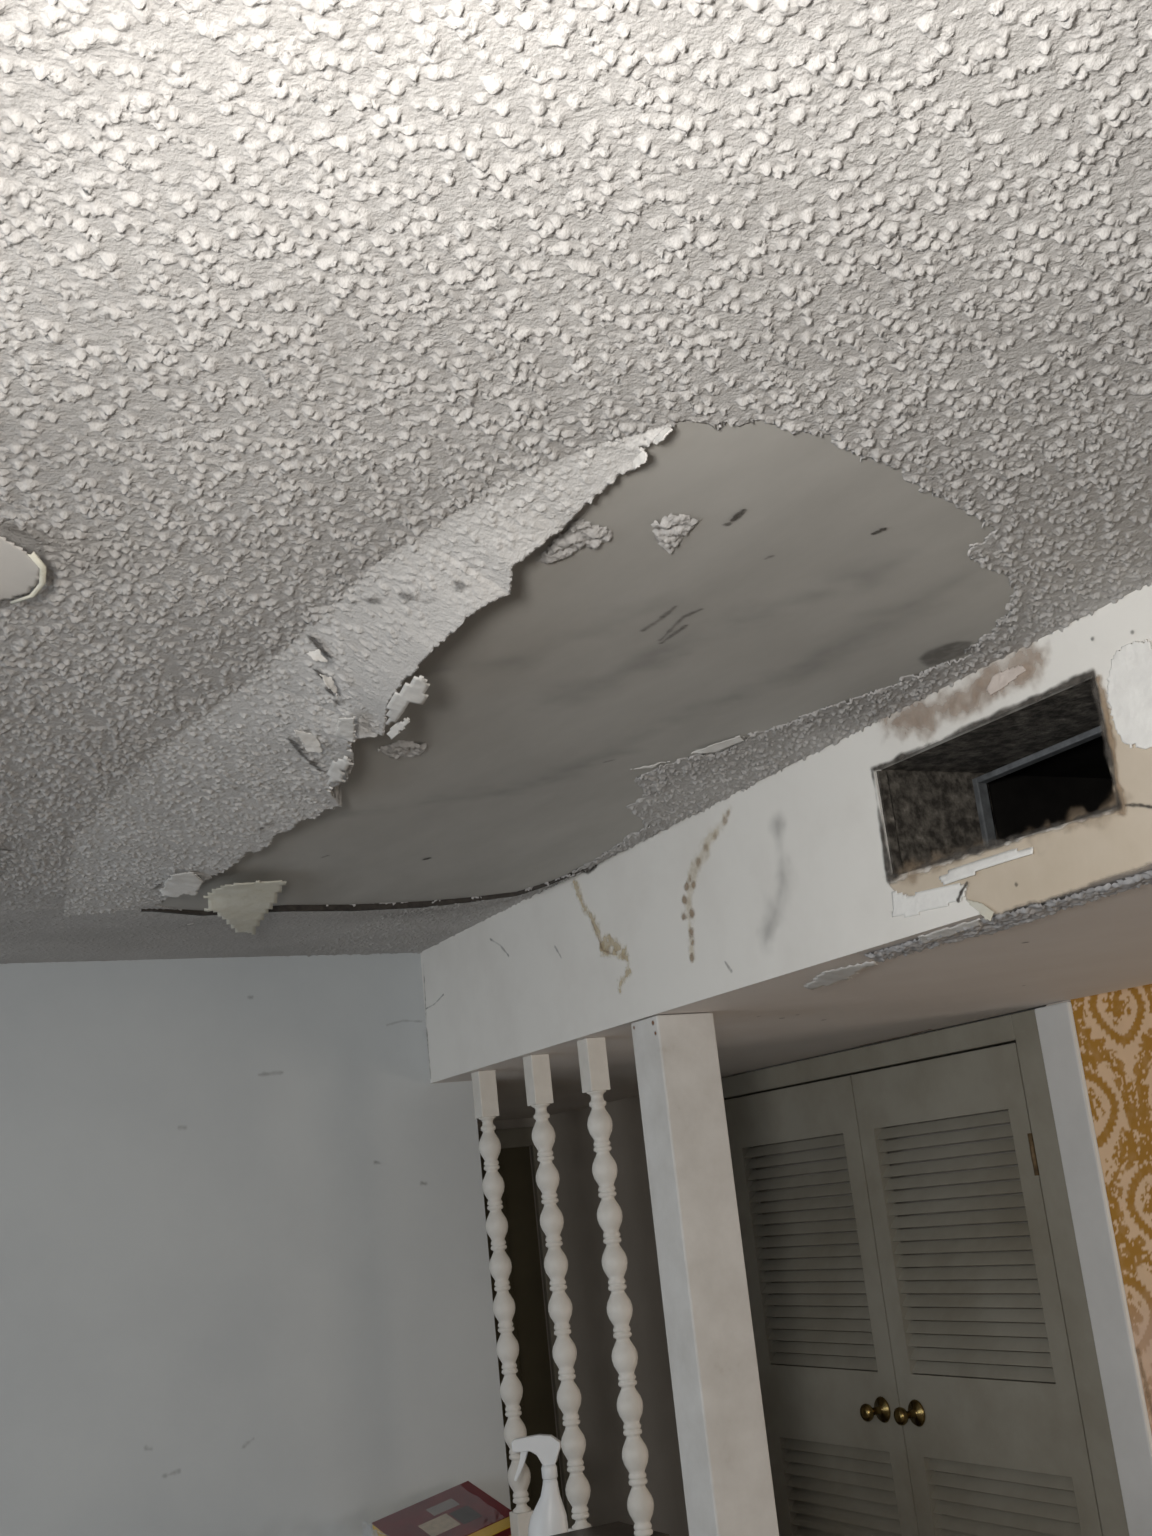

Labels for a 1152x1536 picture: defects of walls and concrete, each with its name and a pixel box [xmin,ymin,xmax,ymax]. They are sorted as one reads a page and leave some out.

peeling [156,420,1015,935]
peeling [890,632,1152,944]
crack [141,908,217,916]
crack [268,868,588,912]
water stain [573,865,631,991]
water stain [682,882,695,961]